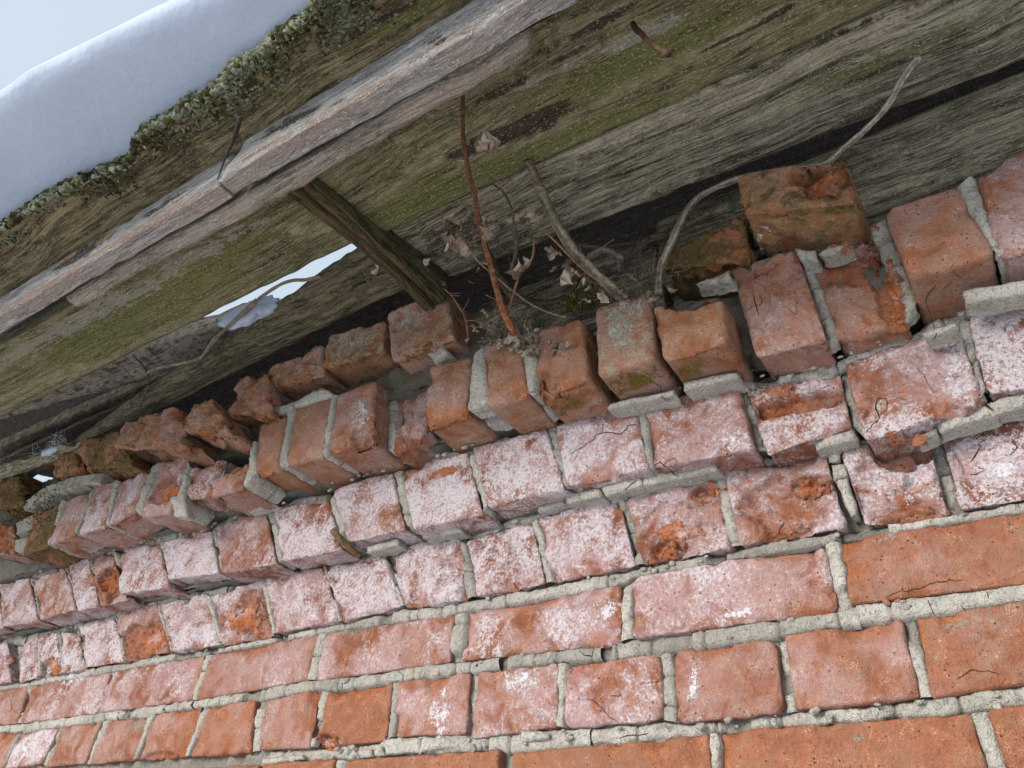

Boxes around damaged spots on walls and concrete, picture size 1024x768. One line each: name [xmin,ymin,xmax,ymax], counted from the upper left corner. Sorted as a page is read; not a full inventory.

spalling [830,225,906,333]
crack [866,398,888,432]
crack [570,417,640,455]
spalling [789,475,831,501]
spalling [644,521,707,562]
spalling [227,601,267,643]
efflorescence [591,597,622,623]
efflorescence [710,602,756,623]
crack [887,579,966,614]
efflorescence [504,669,540,694]
efflorescence [688,659,701,704]
efflorescence [429,687,451,740]